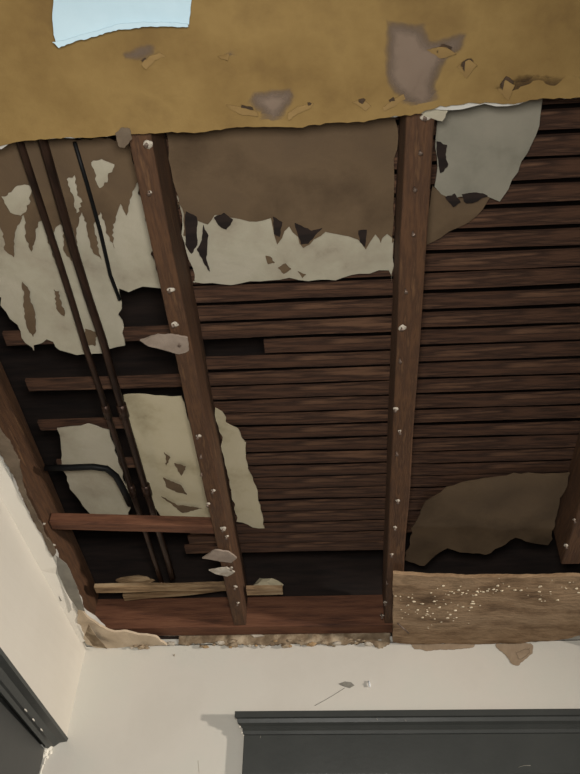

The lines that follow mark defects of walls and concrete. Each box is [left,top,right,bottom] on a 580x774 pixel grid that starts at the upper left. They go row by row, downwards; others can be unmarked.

water stain [0,0,580,148]
flaking render [0,428,391,650]
peeling [411,643,475,651]
peeling [496,643,533,666]